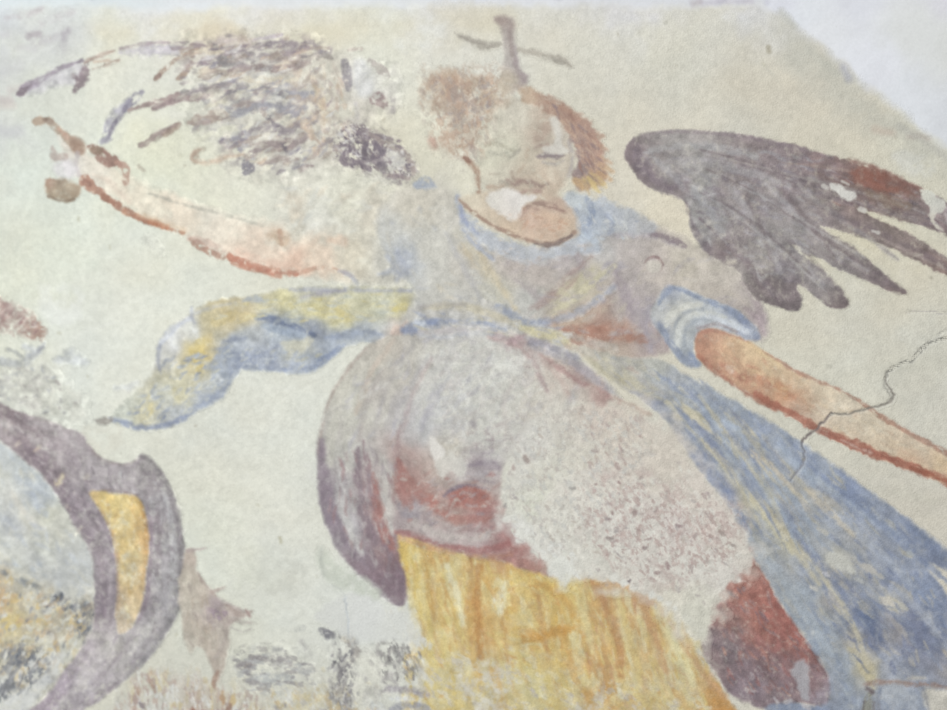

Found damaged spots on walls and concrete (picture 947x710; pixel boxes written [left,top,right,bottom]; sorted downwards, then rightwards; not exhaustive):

crack [789,310,947,483]